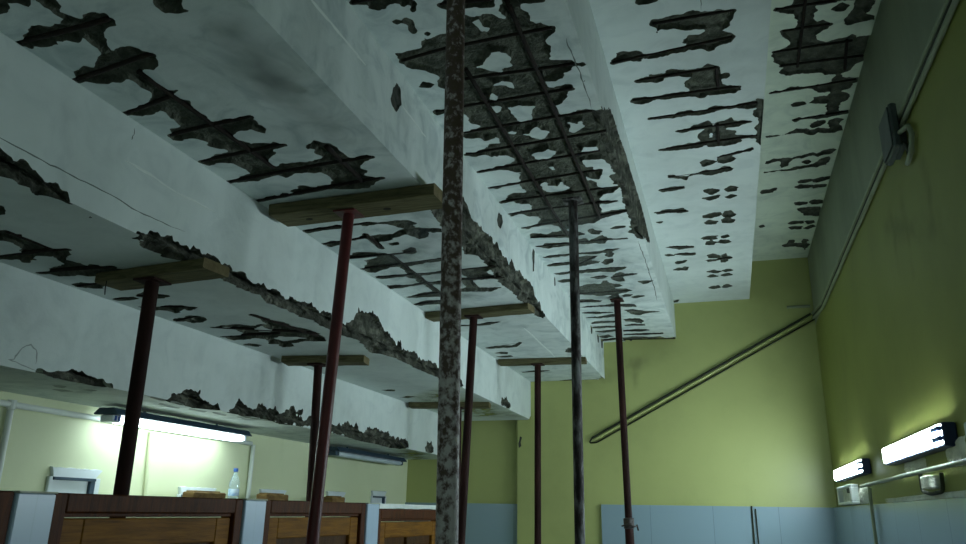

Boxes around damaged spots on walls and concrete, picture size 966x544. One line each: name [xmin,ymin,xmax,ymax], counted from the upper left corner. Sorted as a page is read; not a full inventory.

spalling [349,0,446,89]
spalling [610,9,737,65]
spalling [0,0,385,205]
spalling [630,0,876,192]
crack [1,138,185,232]
spalling [461,0,688,348]
spalling [764,148,837,250]
spalling [132,230,439,378]
spalling [303,209,442,306]
spalling [41,368,113,392]
spalling [150,389,311,427]
spalling [331,421,409,449]